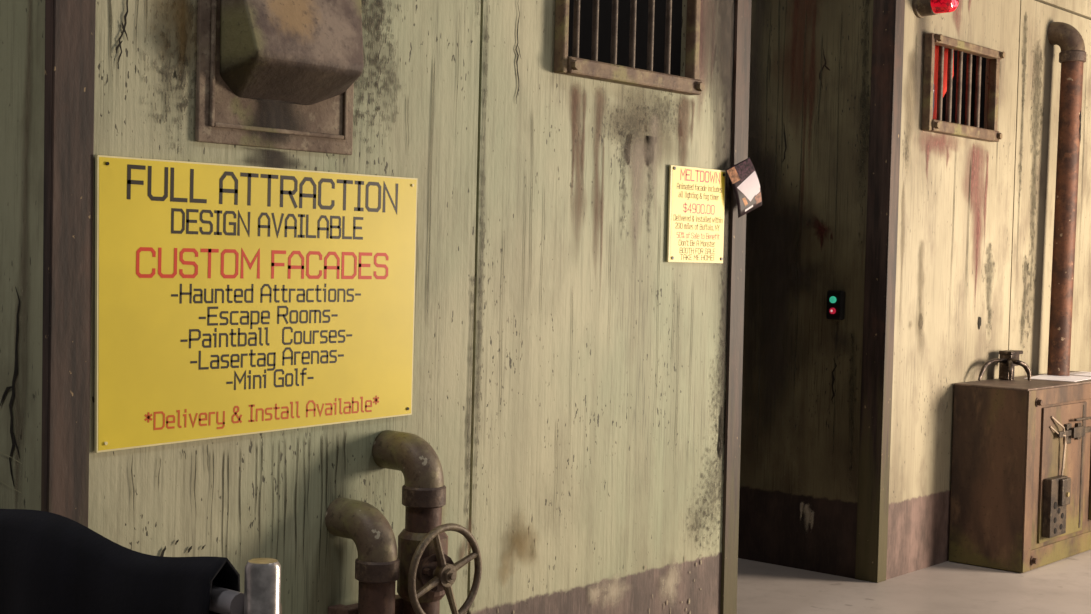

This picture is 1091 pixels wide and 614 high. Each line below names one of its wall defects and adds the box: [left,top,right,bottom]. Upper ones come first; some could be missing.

crack [116,0,128,63]
damp [250,150,296,169]
damp [355,0,409,150]
damp [415,67,435,310]
crack [514,7,522,104]
corrosion [573,90,604,261]
corrosion [681,100,694,159]
damp [756,0,787,425]
corrosion [970,147,988,295]
crack [0,287,20,486]
damp [717,288,728,498]